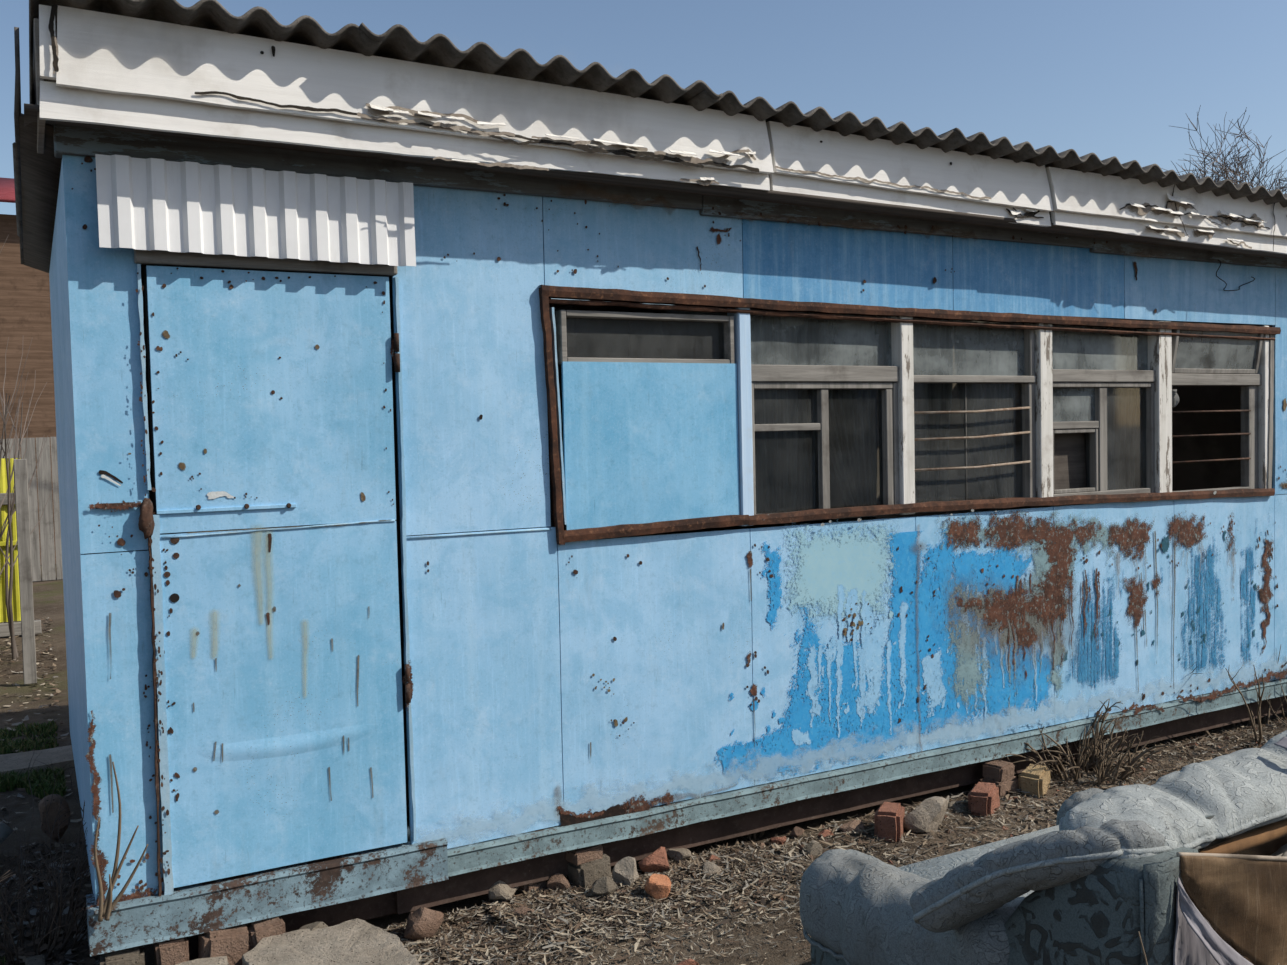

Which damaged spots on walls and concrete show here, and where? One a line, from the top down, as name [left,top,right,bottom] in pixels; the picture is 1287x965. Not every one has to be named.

peeling [195,91,759,185]
peeling [1006,208,1044,218]
peeling [1124,193,1268,249]
corrosion [88,330,189,555]
corrosion [179,463,258,499]
corrosion [188,525,341,657]
peeling [710,509,1170,785]
corrosion [943,508,1287,715]
peeling [1176,509,1270,675]
corrosion [80,539,197,911]
corrosion [556,806,604,819]
corrosion [623,789,674,814]